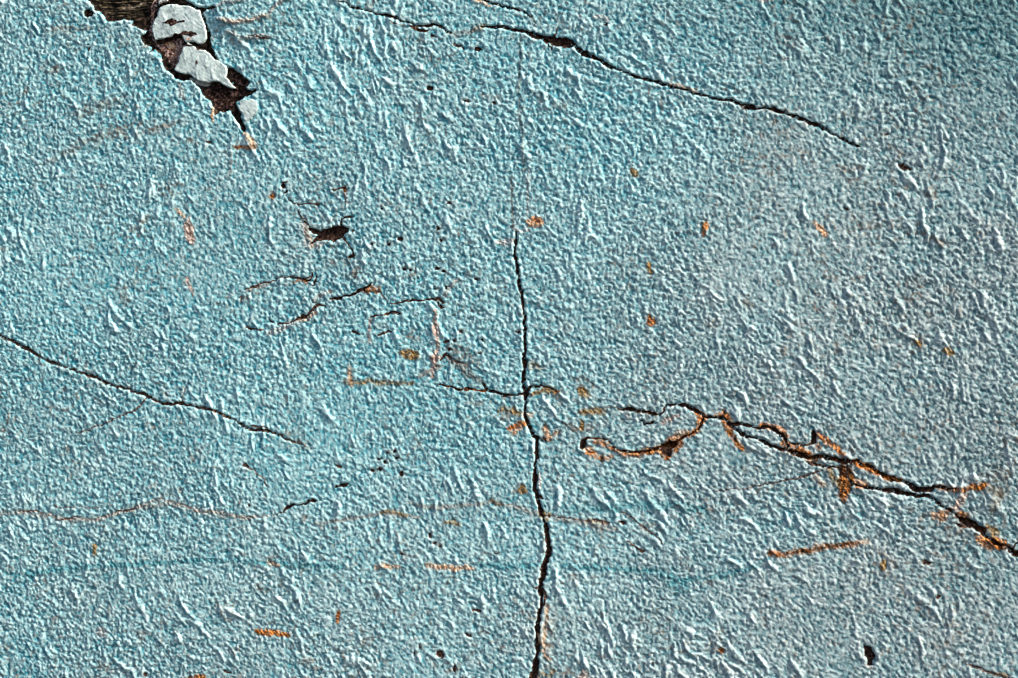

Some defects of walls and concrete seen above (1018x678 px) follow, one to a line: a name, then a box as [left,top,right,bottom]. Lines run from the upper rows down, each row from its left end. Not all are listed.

flaking render [84,0,258,149]
crack [339,0,861,147]
spalling [298,209,355,258]
crack [239,272,446,342]
crack [0,334,301,444]
crack [438,177,663,678]
rust [541,408,603,442]
rust [583,409,744,463]
crack [580,403,1018,557]
rust [768,541,859,557]
rust [759,423,902,502]
rust [930,482,1018,555]